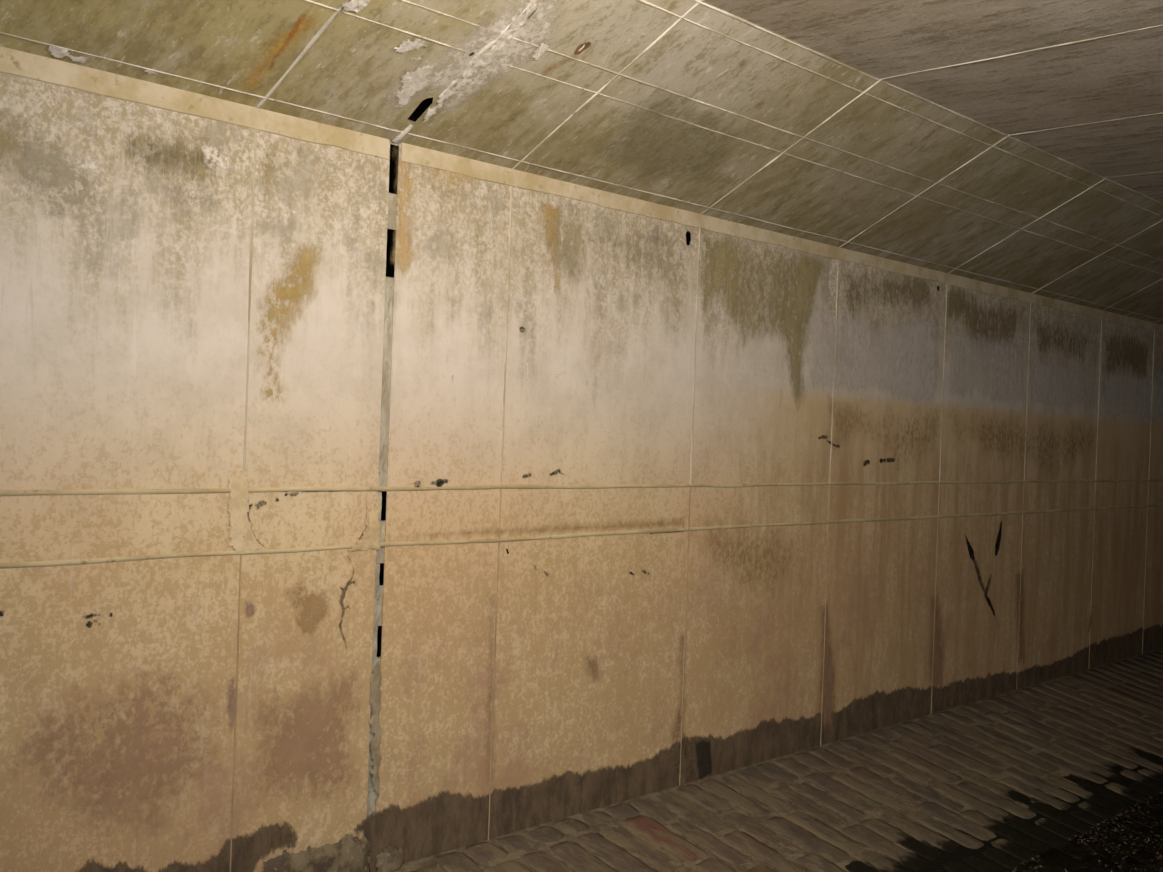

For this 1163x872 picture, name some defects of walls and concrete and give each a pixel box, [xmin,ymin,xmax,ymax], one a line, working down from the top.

water stain [341,0,371,13]
water stain [48,45,87,63]
water stain [387,0,557,123]
crack [339,568,355,641]
water stain [80,860,145,872]
water stain [159,823,297,872]